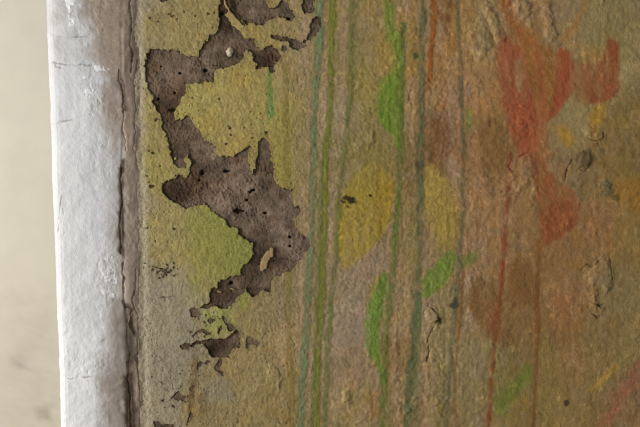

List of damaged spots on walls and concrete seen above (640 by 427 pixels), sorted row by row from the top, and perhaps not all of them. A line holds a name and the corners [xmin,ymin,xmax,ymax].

flaking render [145,0,322,376]